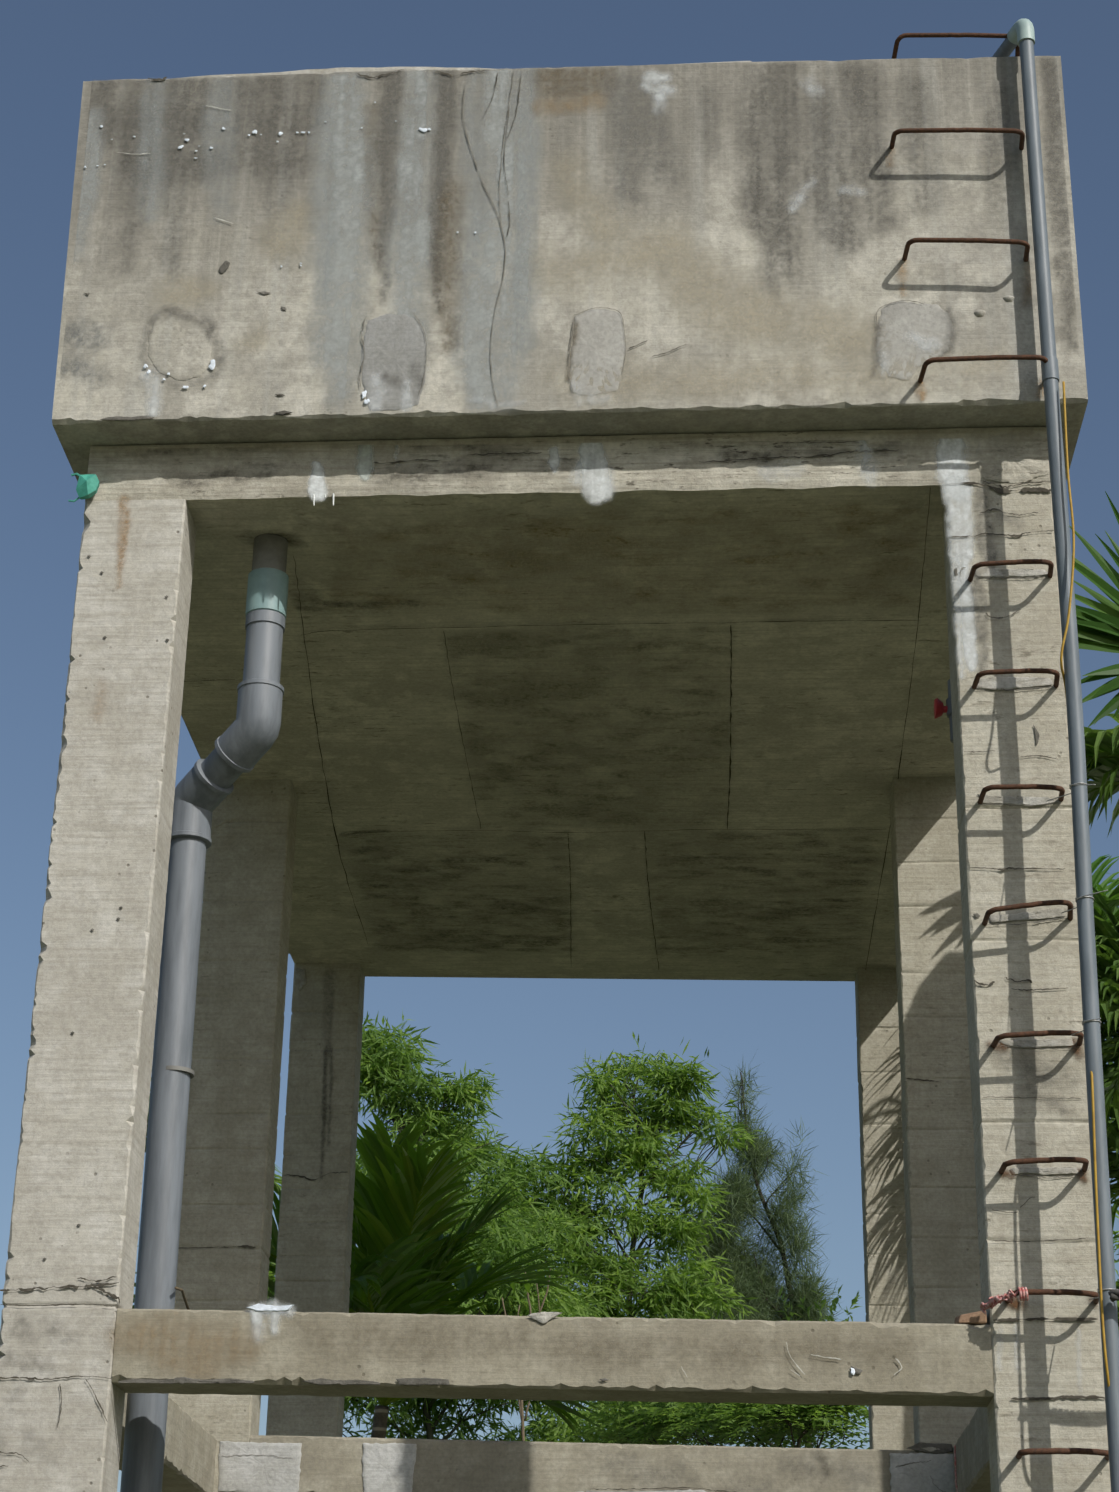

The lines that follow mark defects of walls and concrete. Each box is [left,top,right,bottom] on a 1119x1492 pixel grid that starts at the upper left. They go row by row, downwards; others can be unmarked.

leakage [76,69,668,408]
crack [357,69,522,406]
peeling [143,359,215,389]
crack [373,452,542,464]
leakage [580,443,611,502]
crack [0,1276,120,1307]